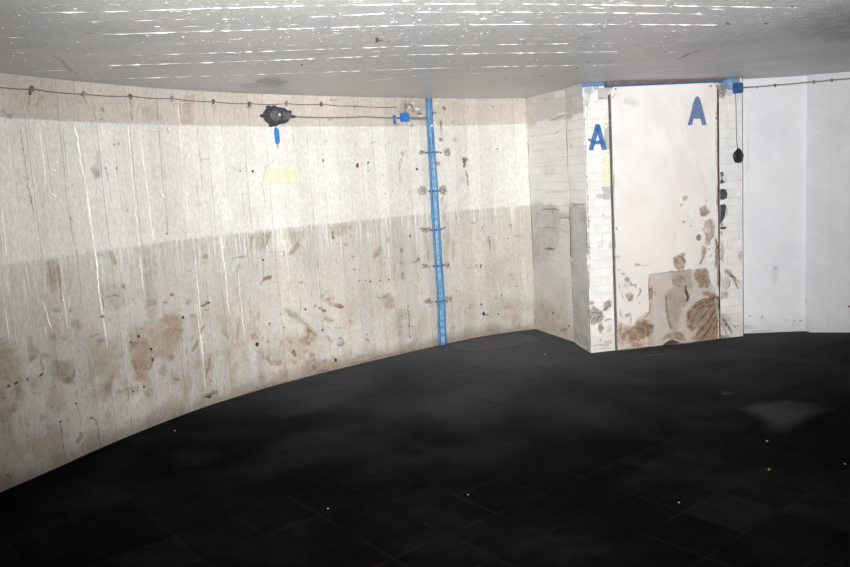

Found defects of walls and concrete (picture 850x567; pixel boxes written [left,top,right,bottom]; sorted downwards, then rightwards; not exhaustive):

peeling [707,239,725,286]